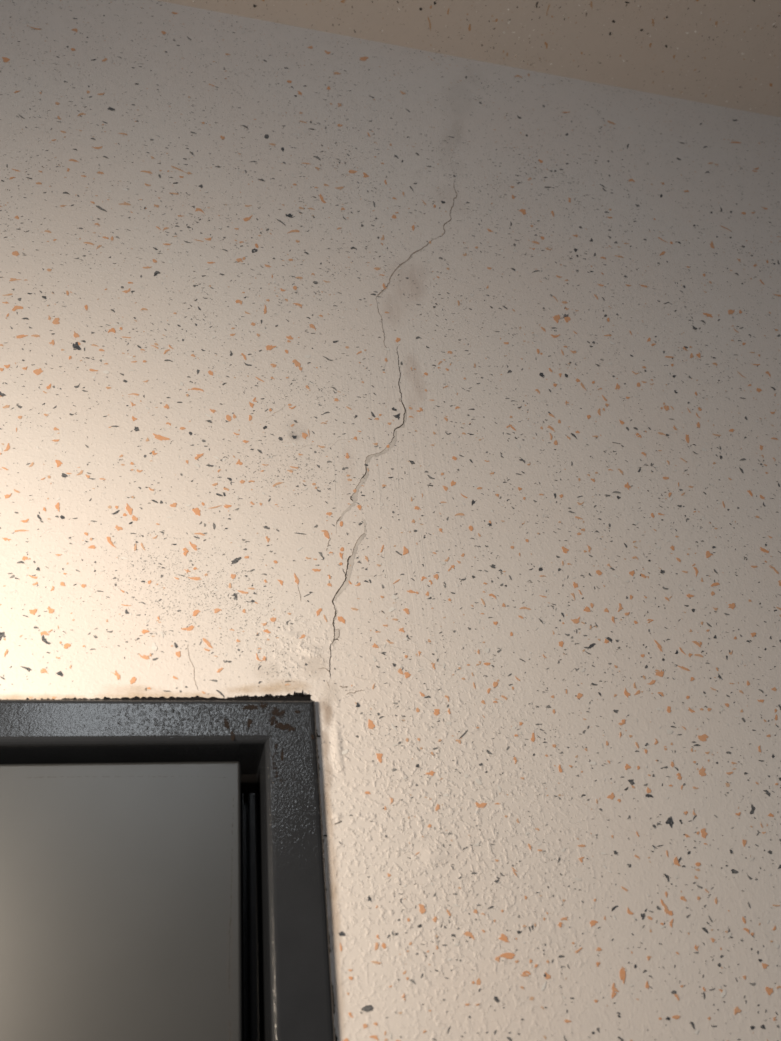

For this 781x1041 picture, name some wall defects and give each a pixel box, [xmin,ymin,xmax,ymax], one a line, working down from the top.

crack [319,129,459,695]